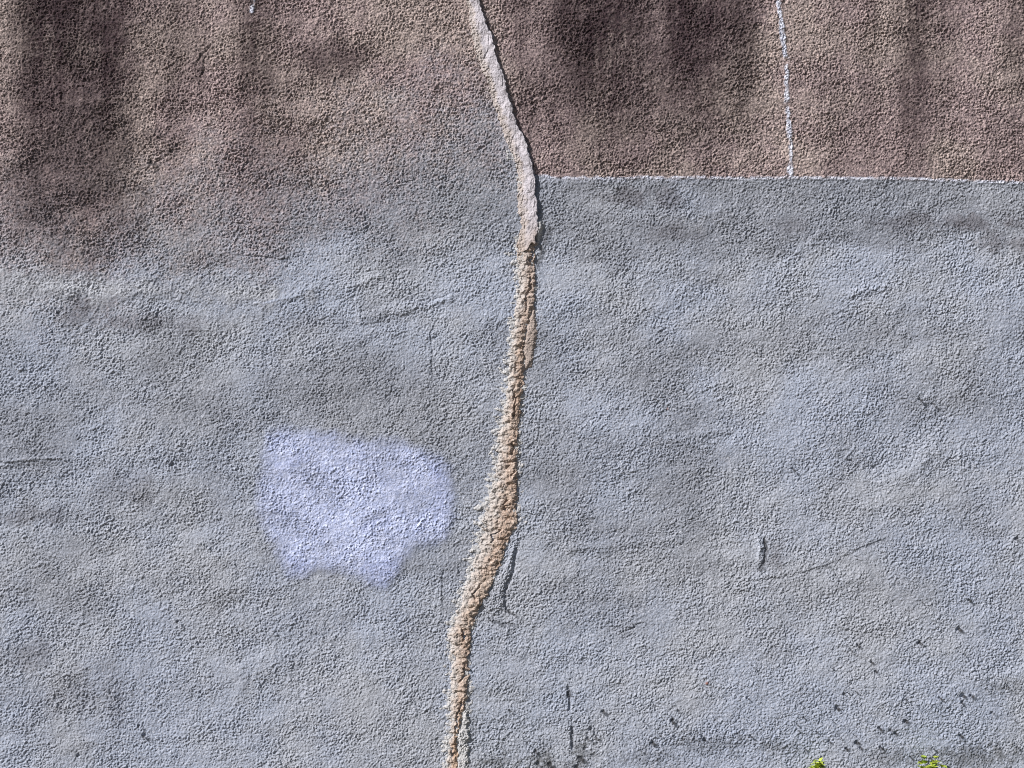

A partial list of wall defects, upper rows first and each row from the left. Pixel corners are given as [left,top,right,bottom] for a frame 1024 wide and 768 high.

damp [29,0,127,151]
damp [555,0,643,124]
damp [663,0,748,110]
damp [904,2,926,105]
crack [437,0,539,768]